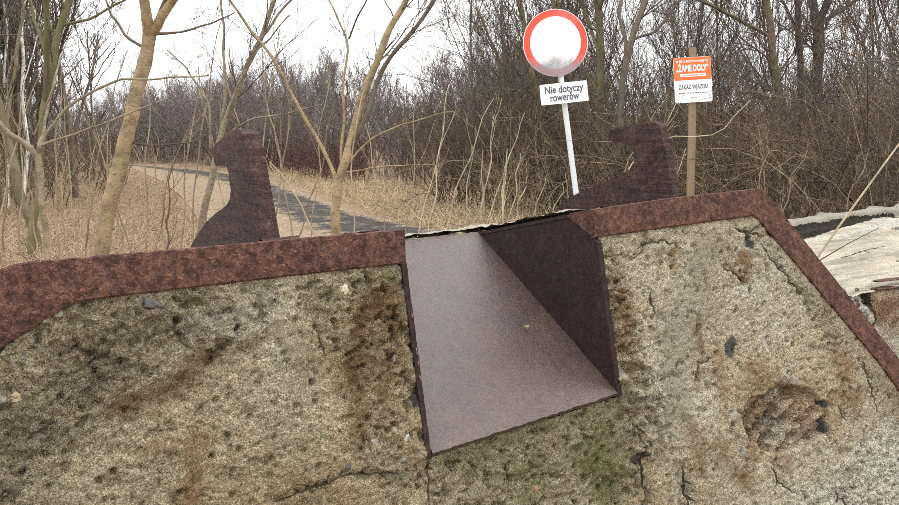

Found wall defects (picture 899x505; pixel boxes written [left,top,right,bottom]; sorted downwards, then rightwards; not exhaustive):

crack [634,239,681,258]
rust [873,277,899,291]
spalling [739,383,826,454]
crack [272,459,432,502]